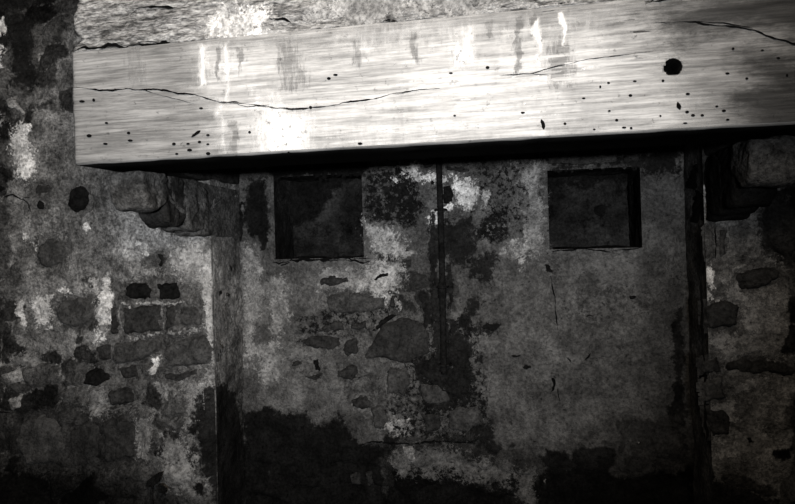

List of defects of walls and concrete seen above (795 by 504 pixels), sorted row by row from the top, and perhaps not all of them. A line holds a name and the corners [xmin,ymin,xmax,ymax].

flaking render [6,97,25,115]
spalling [29,178,53,209]
spalling [25,231,74,275]
spalling [62,179,96,217]
water stain [362,156,553,285]
flaking render [1,350,44,385]
spalling [8,249,222,498]
spalling [229,213,542,504]
water stain [384,293,501,444]
crack [697,220,717,460]